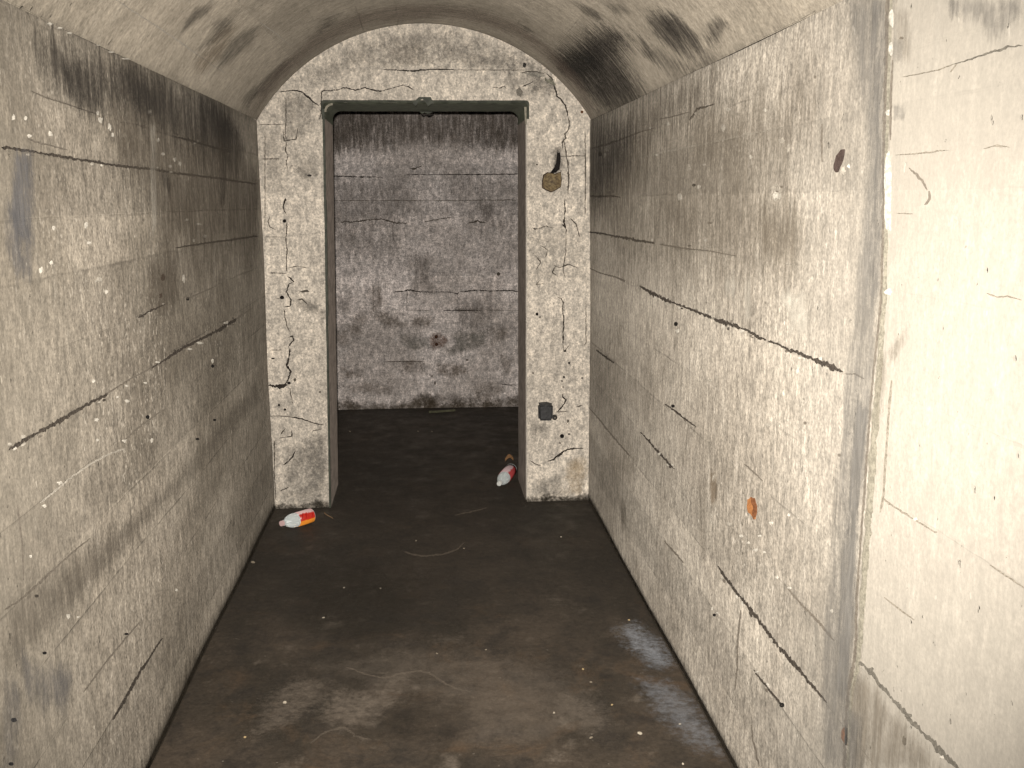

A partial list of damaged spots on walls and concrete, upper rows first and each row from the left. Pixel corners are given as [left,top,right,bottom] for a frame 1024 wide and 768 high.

damp [50,28,257,229]
damp [556,8,634,108]
damp [651,14,723,55]
crack [2,69,736,498]
crack [590,0,1024,768]